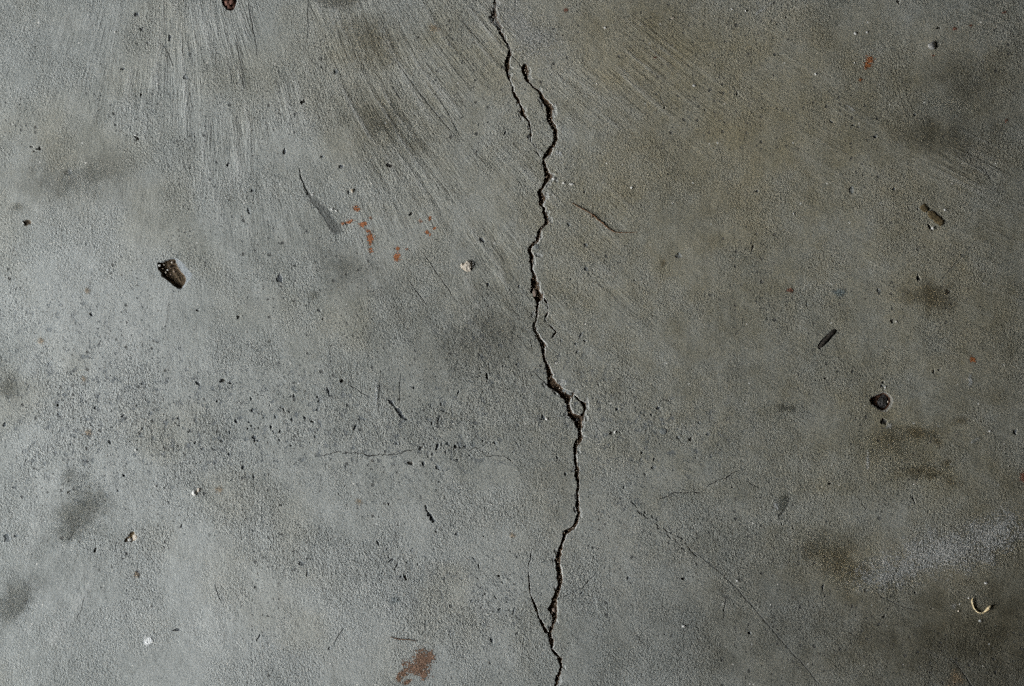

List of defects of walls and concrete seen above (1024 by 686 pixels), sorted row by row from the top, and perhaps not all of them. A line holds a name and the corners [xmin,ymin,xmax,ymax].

corrosion [341,205,375,253]
crack [489,0,608,686]
crack [316,441,429,457]
crack [455,447,521,473]
corrosion [395,648,435,685]